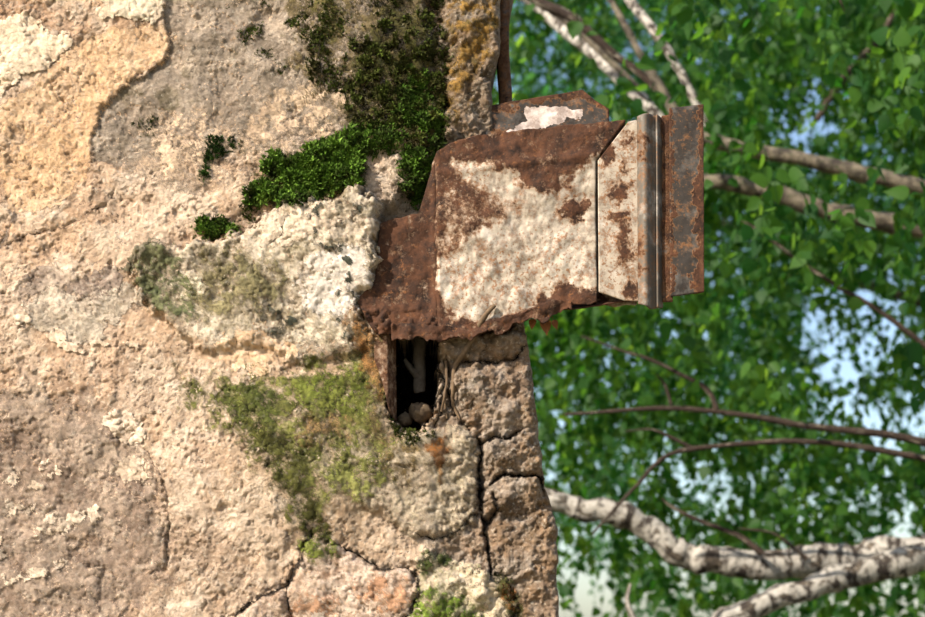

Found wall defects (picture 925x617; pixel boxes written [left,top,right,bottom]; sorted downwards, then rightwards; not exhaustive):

crack [0,193,114,247]
corrosion [391,299,572,342]
peeling [355,334,481,538]
crack [415,346,544,576]
crack [234,535,420,617]
spalling [237,537,517,617]